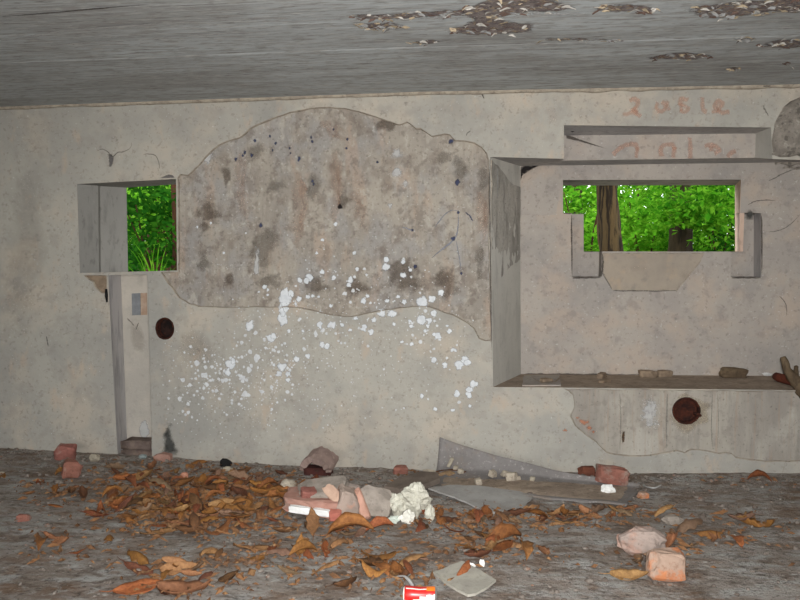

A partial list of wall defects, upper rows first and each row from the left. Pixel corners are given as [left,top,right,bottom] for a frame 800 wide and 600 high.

flaking render [161,107,537,341]
flaking render [522,375,800,462]